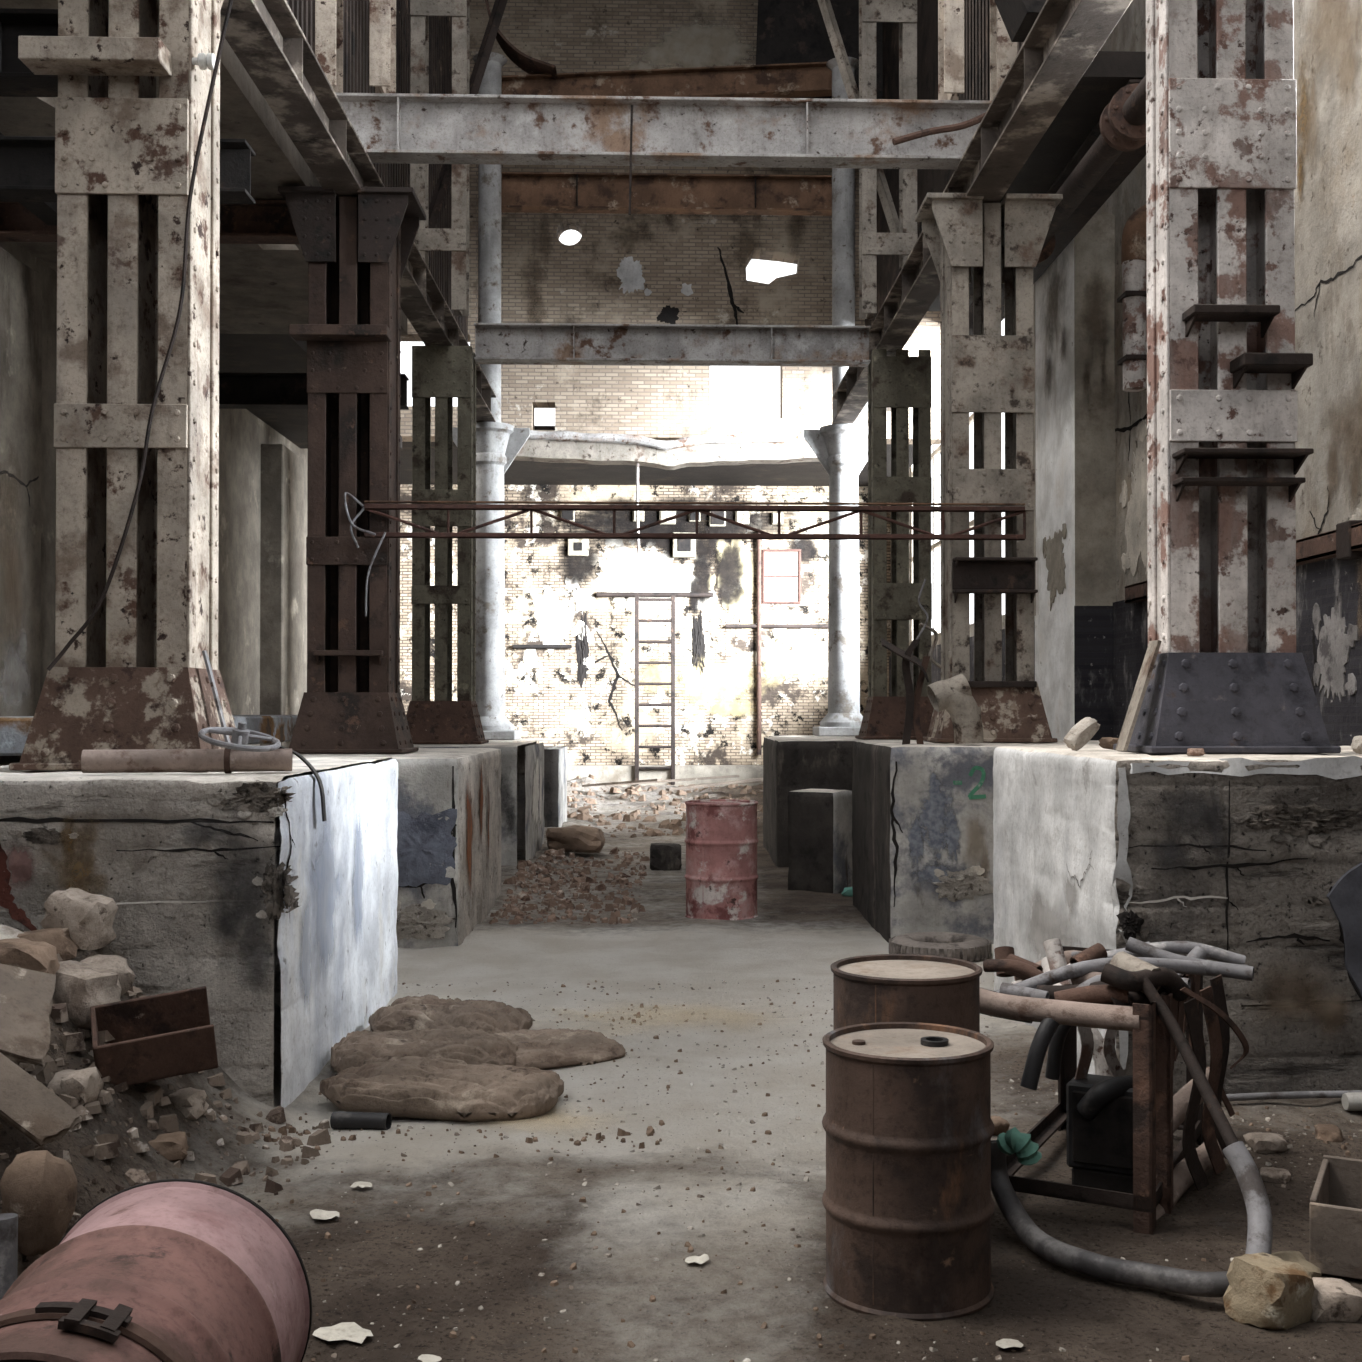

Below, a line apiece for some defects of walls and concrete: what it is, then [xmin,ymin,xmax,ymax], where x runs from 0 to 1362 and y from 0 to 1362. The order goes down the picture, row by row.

crack [1295,255,1362,312]
peeling [524,539,757,690]
peeling [773,621,826,685]
peeling [1312,593,1359,702]
crack [0,799,295,869]
water stain [908,772,988,885]
corrosion [0,844,37,931]
crack [115,900,290,917]
water stain [218,845,271,986]